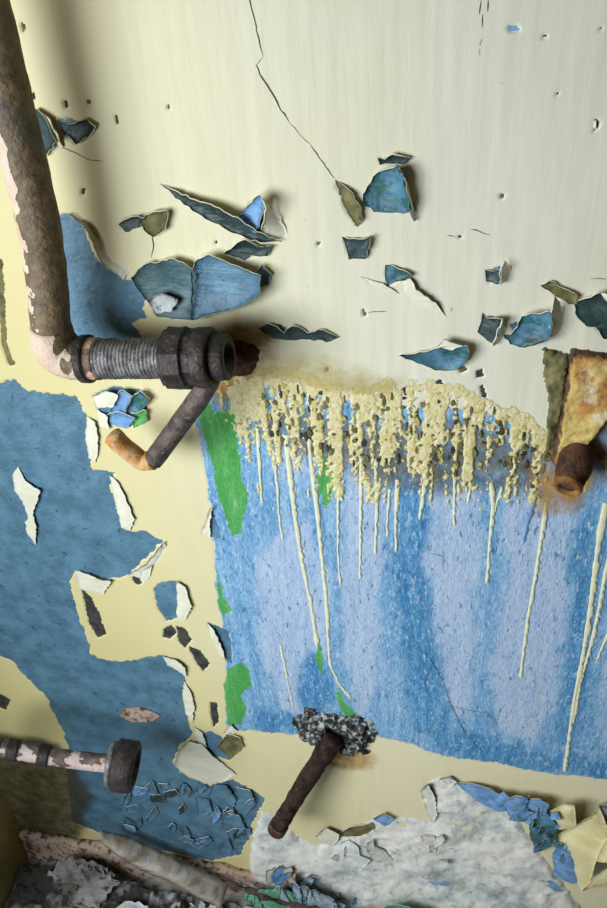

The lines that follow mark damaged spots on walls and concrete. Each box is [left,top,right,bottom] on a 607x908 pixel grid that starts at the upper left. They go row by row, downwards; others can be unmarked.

crack [249,0,335,179]
peeling [60,183,288,338]
rust [215,325,260,396]
peeling [0,379,607,908]
water stain [271,434,352,699]
peeling [335,153,419,227]
spalling [217,339,551,511]
water stain [374,459,400,555]
water stain [485,482,503,584]
peeling [478,280,607,348]
rust [539,446,607,507]
water stain [563,502,607,772]